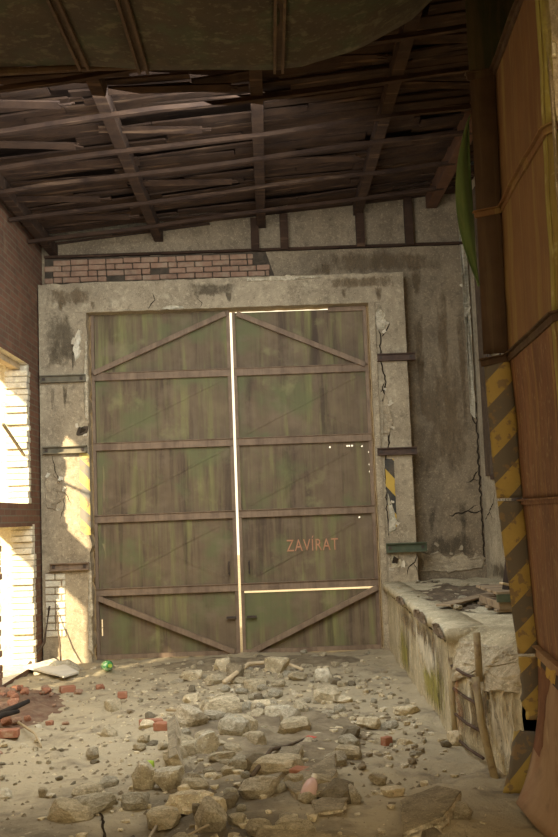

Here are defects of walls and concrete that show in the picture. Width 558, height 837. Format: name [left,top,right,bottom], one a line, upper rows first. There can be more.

damp [51,289,93,366]
crack [378,322,390,402]
crack [385,425,393,536]
crack [452,402,495,565]
spalling [0,524,67,686]
damp [396,614,449,711]
crack [98,813,106,837]